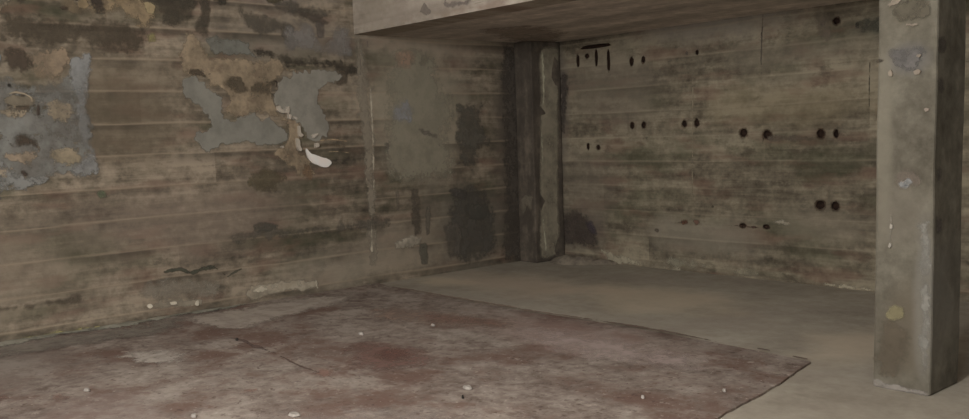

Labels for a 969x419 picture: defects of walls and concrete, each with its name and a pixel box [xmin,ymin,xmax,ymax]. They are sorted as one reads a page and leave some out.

peeling [0,46,99,199]
damp [0,13,143,53]
peeling [60,0,155,41]
peeling [178,33,343,179]
damp [444,26,639,265]
damp [411,189,431,264]